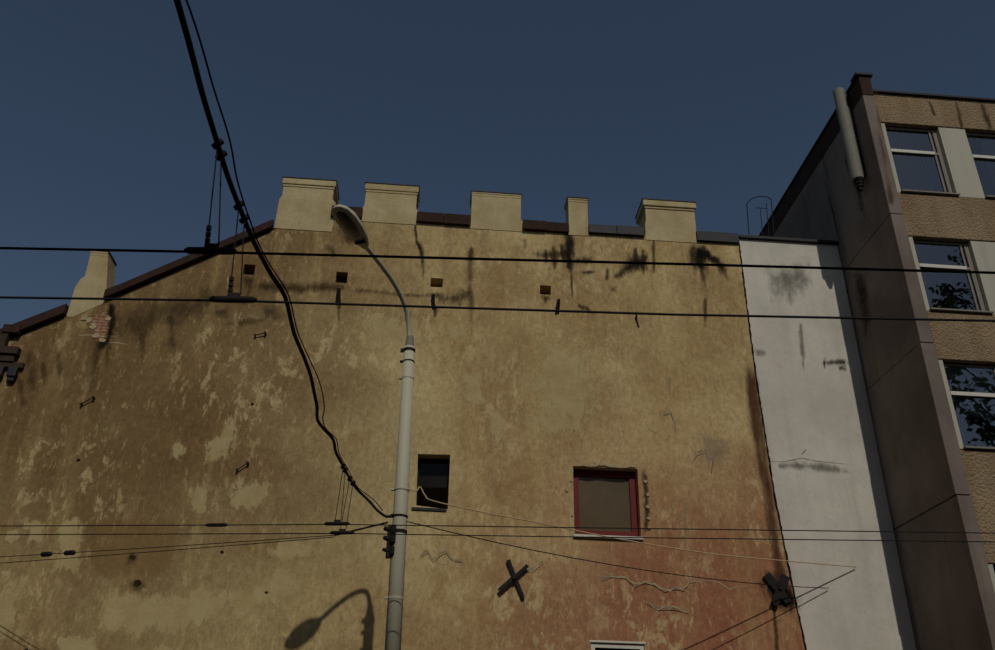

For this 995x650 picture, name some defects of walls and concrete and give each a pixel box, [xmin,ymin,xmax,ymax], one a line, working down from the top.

leakage [537,233,591,287]
leakage [606,240,655,280]
leakage [689,246,725,279]
flaking render [79,311,124,344]
leakage [748,370,795,650]
crack [420,550,462,569]